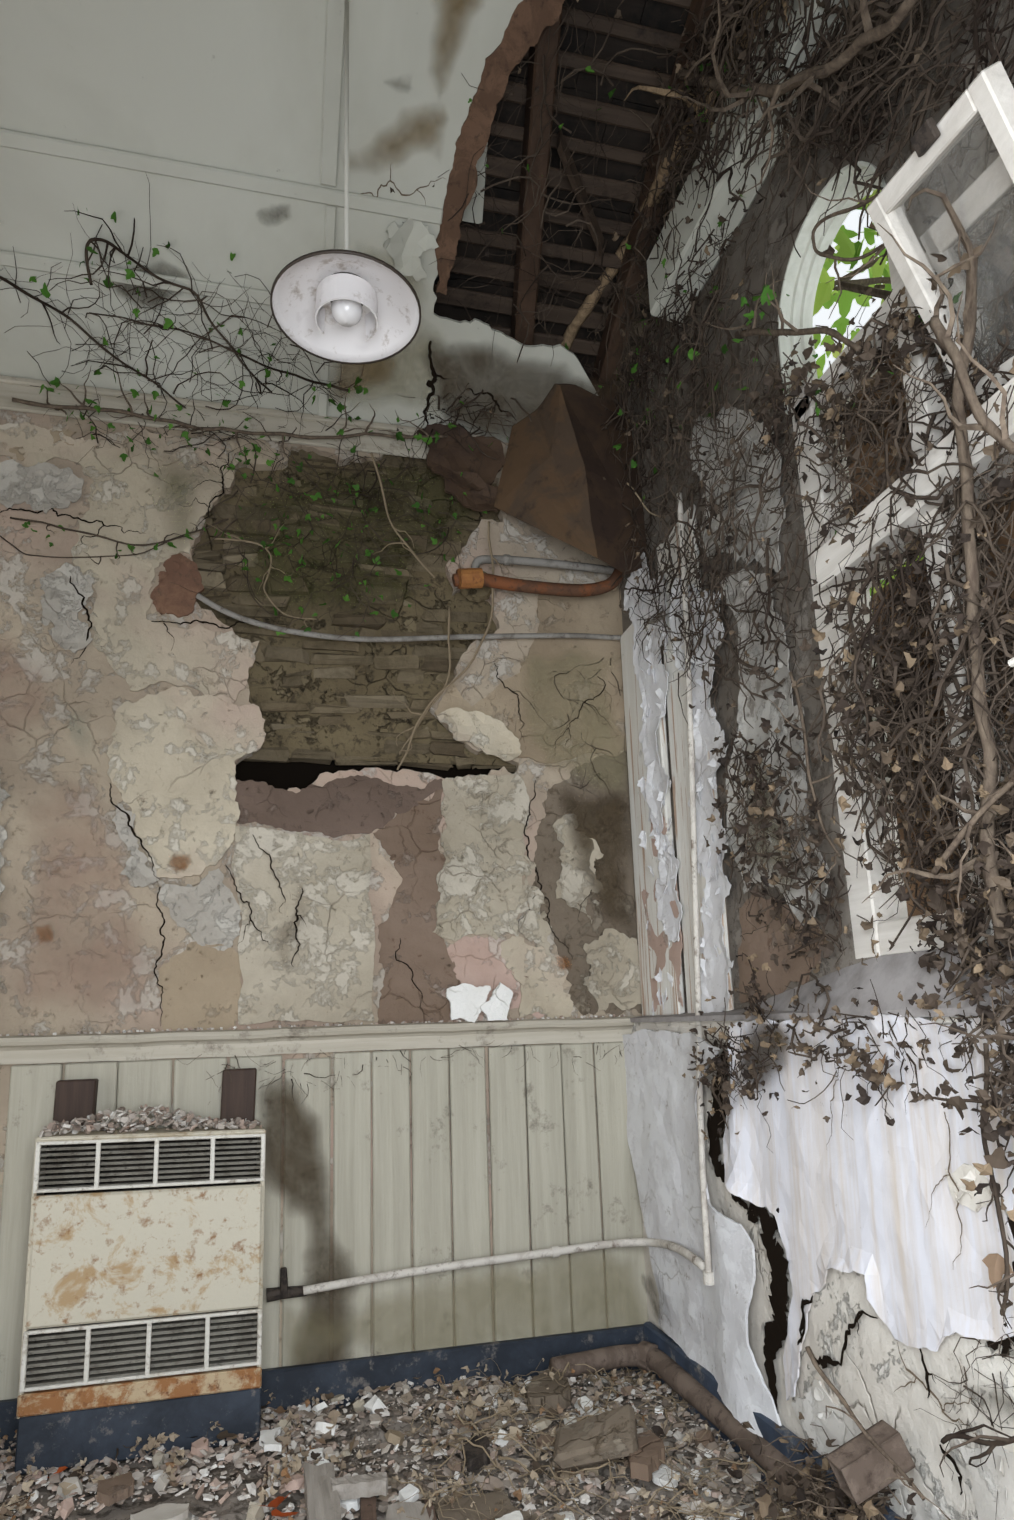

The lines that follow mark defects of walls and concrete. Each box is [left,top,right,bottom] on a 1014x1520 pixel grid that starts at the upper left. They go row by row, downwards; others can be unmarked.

damp [441,0,471,52]
spalling [383,0,565,295]
crack [109,783,165,1026]
peeling [0,402,1014,1422]
crack [707,1051,987,1495]
crack [987,1323,1014,1358]
crack [1006,1216,1014,1272]